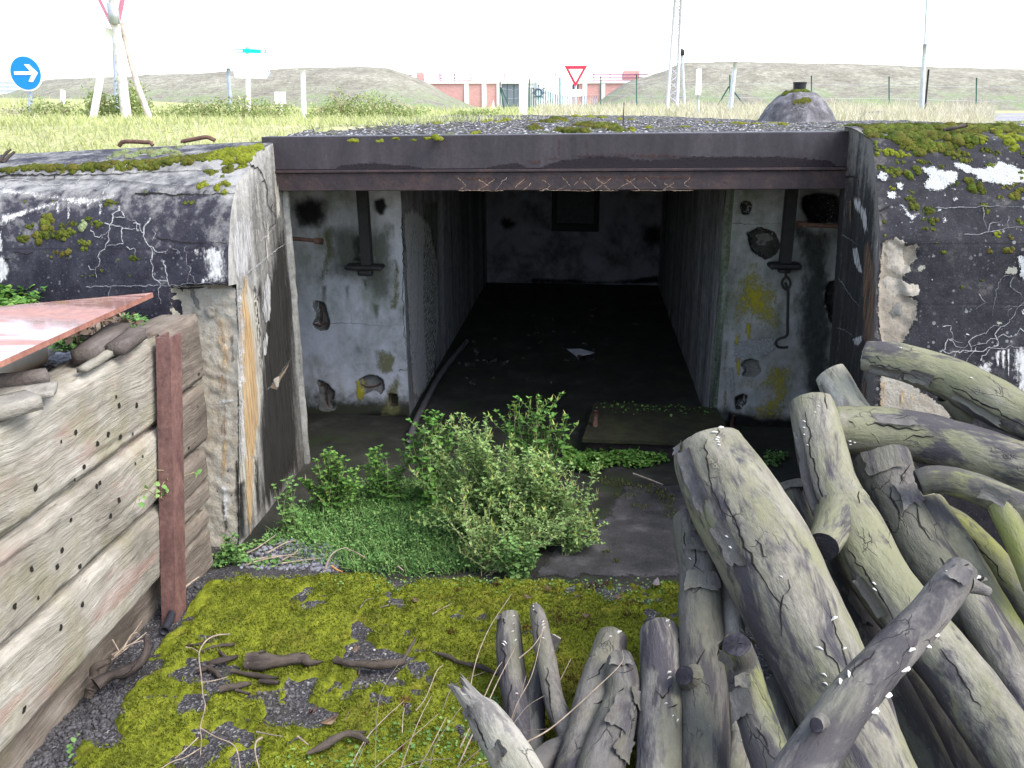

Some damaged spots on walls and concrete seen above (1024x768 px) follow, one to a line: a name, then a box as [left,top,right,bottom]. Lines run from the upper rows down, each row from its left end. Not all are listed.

corrosion [335,162,434,173]
corrosion [458,139,835,191]
crack [0,161,284,300]
spalling [747,227,780,260]
crack [936,205,1019,235]
spalling [313,301,330,331]
leakage [295,198,450,401]
leakage [724,263,792,427]
spalling [877,237,920,343]
crack [940,275,1024,362]
spalling [170,284,238,548]
spalling [359,375,398,407]